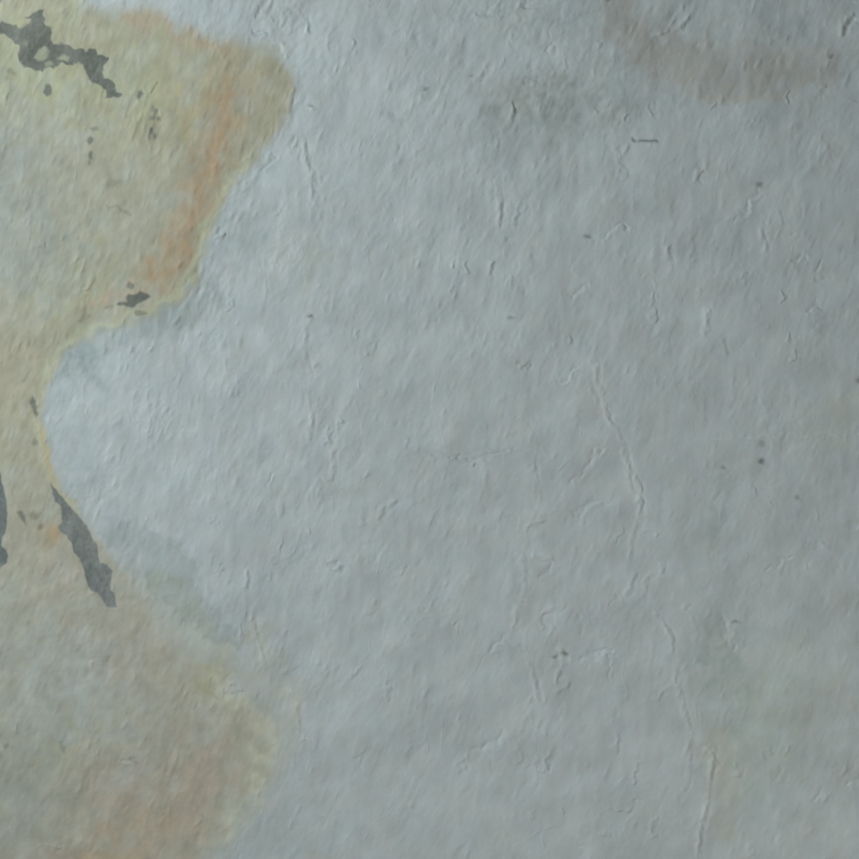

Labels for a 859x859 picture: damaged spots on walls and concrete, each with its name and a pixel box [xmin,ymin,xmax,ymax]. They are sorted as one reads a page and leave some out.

water stain [587,0,858,115]
water stain [0,0,315,859]
crack [591,360,717,859]